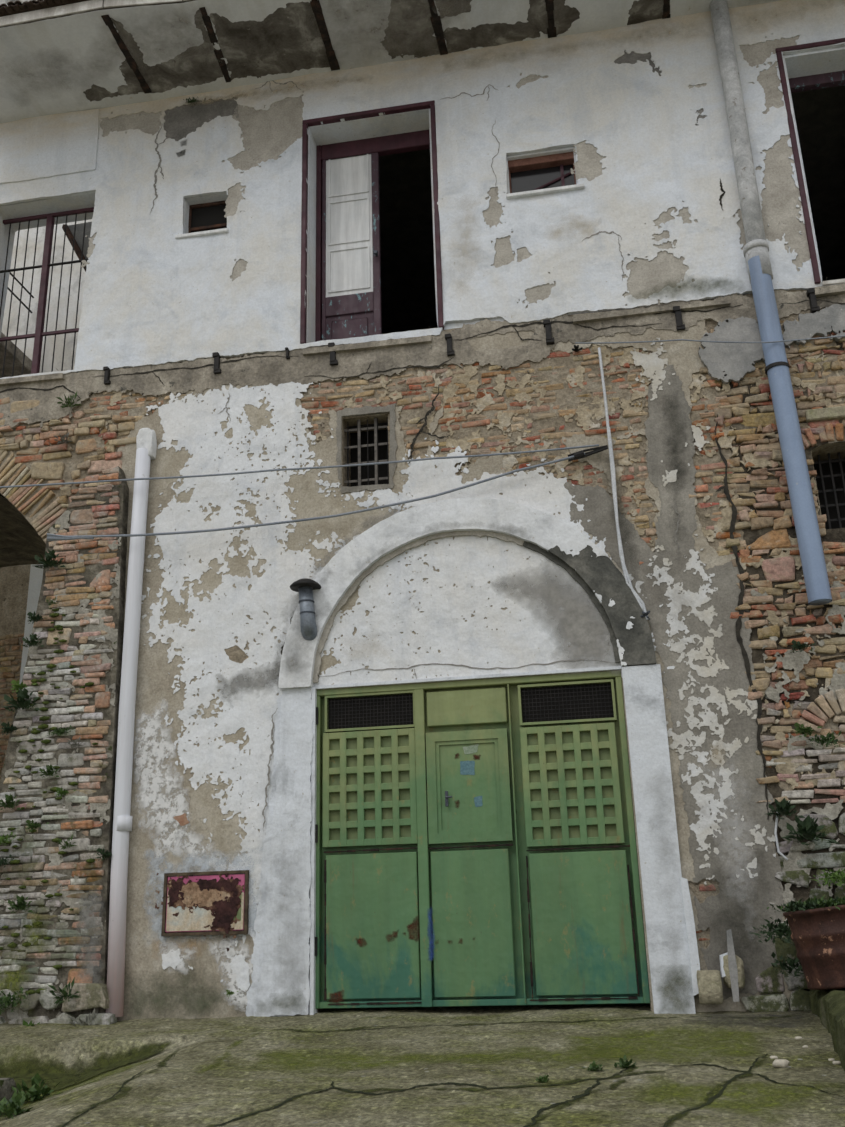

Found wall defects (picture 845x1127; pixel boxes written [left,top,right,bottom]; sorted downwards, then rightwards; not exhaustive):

peeling [83,2,324,218]
peeling [740,36,800,114]
crack [150,126,174,213]
peeling [755,135,810,271]
peeling [220,391,274,445]
crack [0,304,743,465]
peeling [158,463,398,632]
spalling [224,645,249,663]
flaking render [300,338,776,903]
water stain [503,573,611,663]
rust [155,873,244,952]
rust [388,919,420,940]